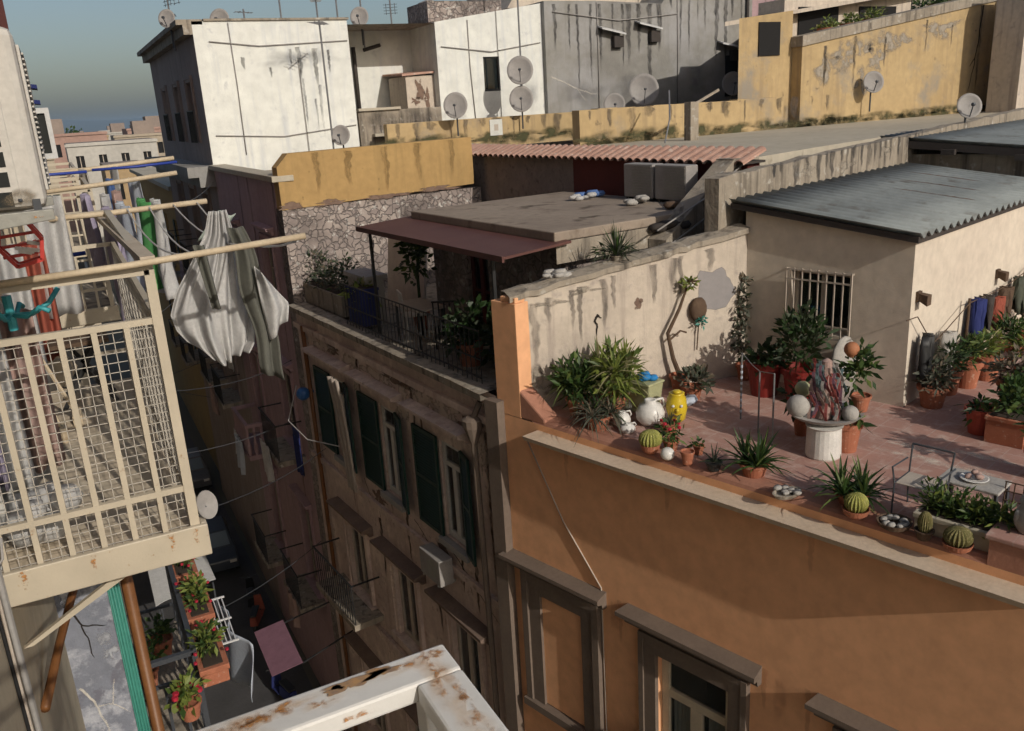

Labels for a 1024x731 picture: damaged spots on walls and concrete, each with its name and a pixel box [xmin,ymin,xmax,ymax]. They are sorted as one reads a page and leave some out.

water stain [554,0,698,59]
flaking render [814,32,912,94]
crack [968,5,984,89]
rust [314,651,469,706]
rust [236,701,290,729]